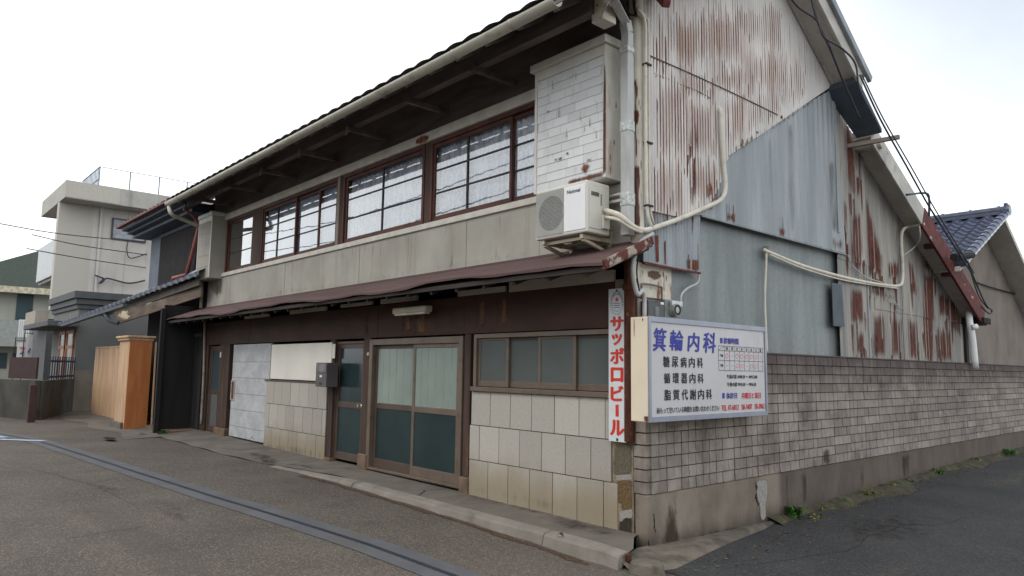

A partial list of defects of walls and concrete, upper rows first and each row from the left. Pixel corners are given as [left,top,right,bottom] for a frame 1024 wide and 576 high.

corrosion [634,0,816,234]
corrosion [833,126,960,361]